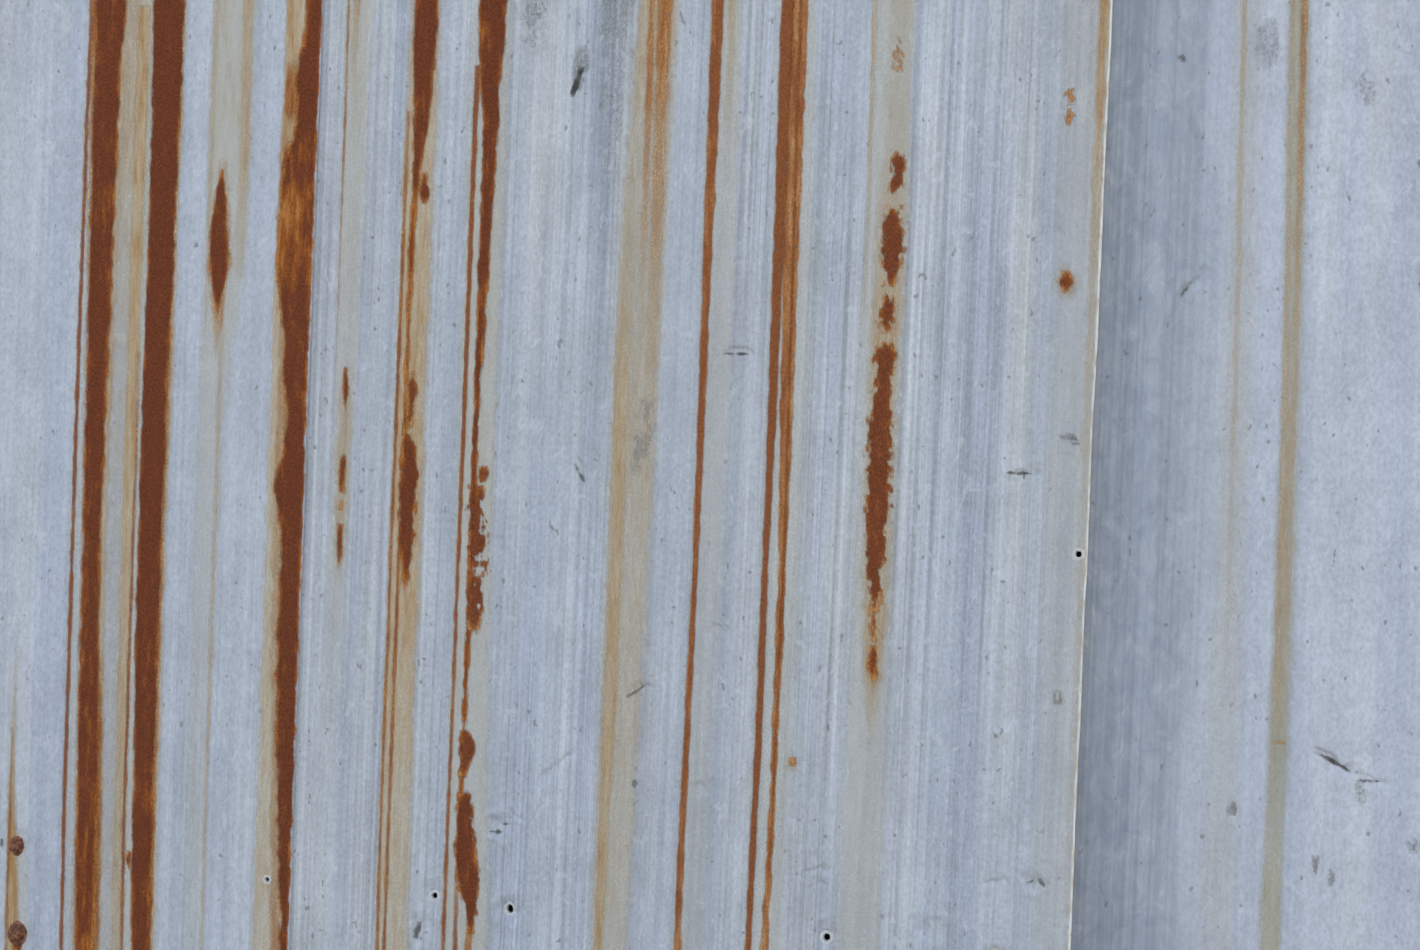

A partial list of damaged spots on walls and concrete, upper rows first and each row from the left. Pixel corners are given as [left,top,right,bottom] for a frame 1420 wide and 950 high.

corrosion [5,735,24,950]
corrosion [59,0,130,950]
corrosion [125,0,187,950]
corrosion [207,169,231,335]
corrosion [252,0,322,950]
corrosion [375,0,439,950]
corrosion [441,0,507,950]
corrosion [674,0,739,950]
corrosion [745,0,814,950]
corrosion [863,151,906,708]
corrosion [1059,271,1073,293]